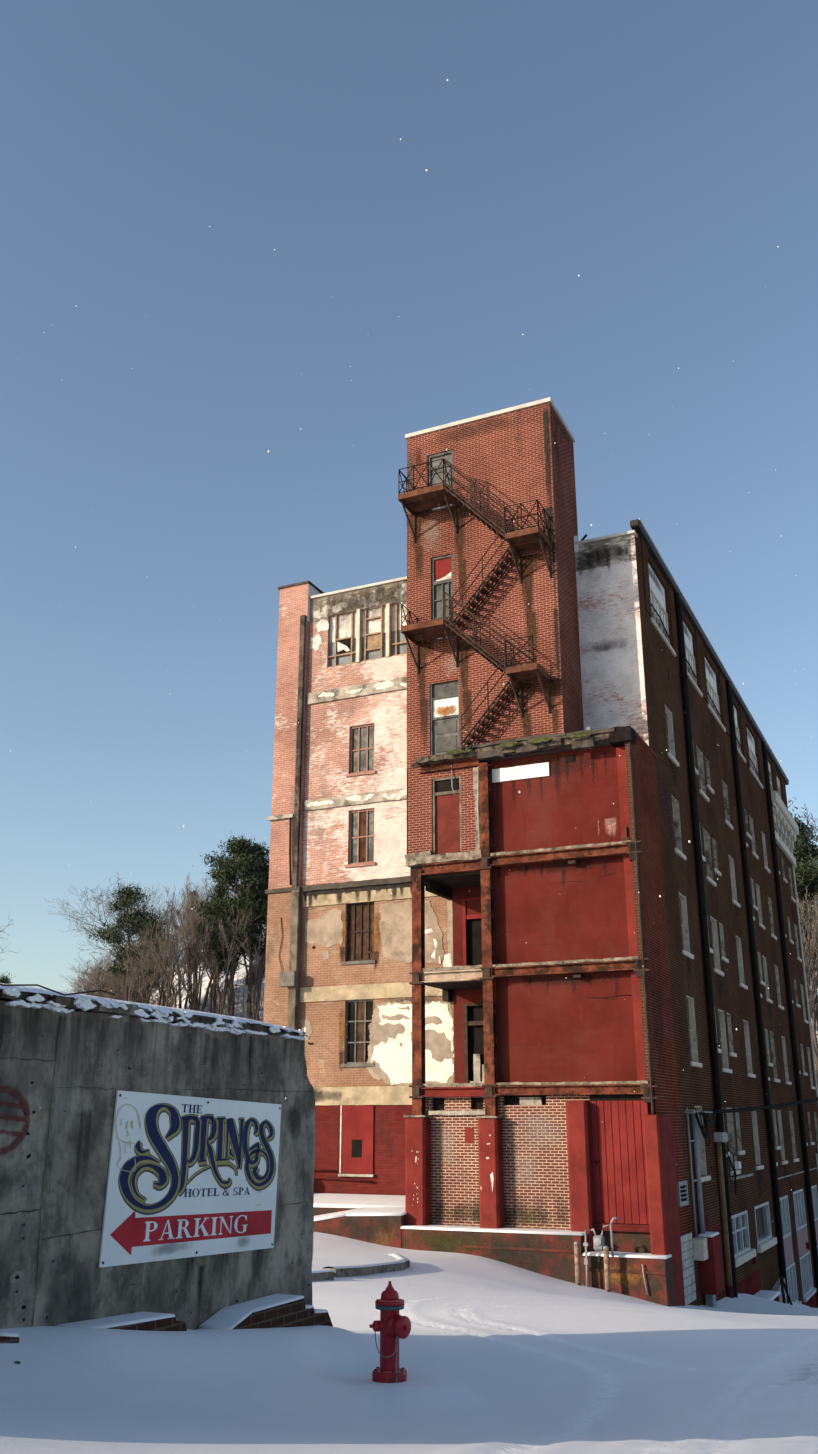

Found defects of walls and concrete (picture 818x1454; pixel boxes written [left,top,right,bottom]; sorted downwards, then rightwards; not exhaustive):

rust [409,511,428,572]
rust [451,505,468,605]
peeling [310,583,407,651]
rust [517,554,540,649]
peeling [318,680,407,697]
rust [413,637,474,740]
rust [513,679,560,737]
peeling [425,928,452,967]
flaking render [366,998,454,1086]